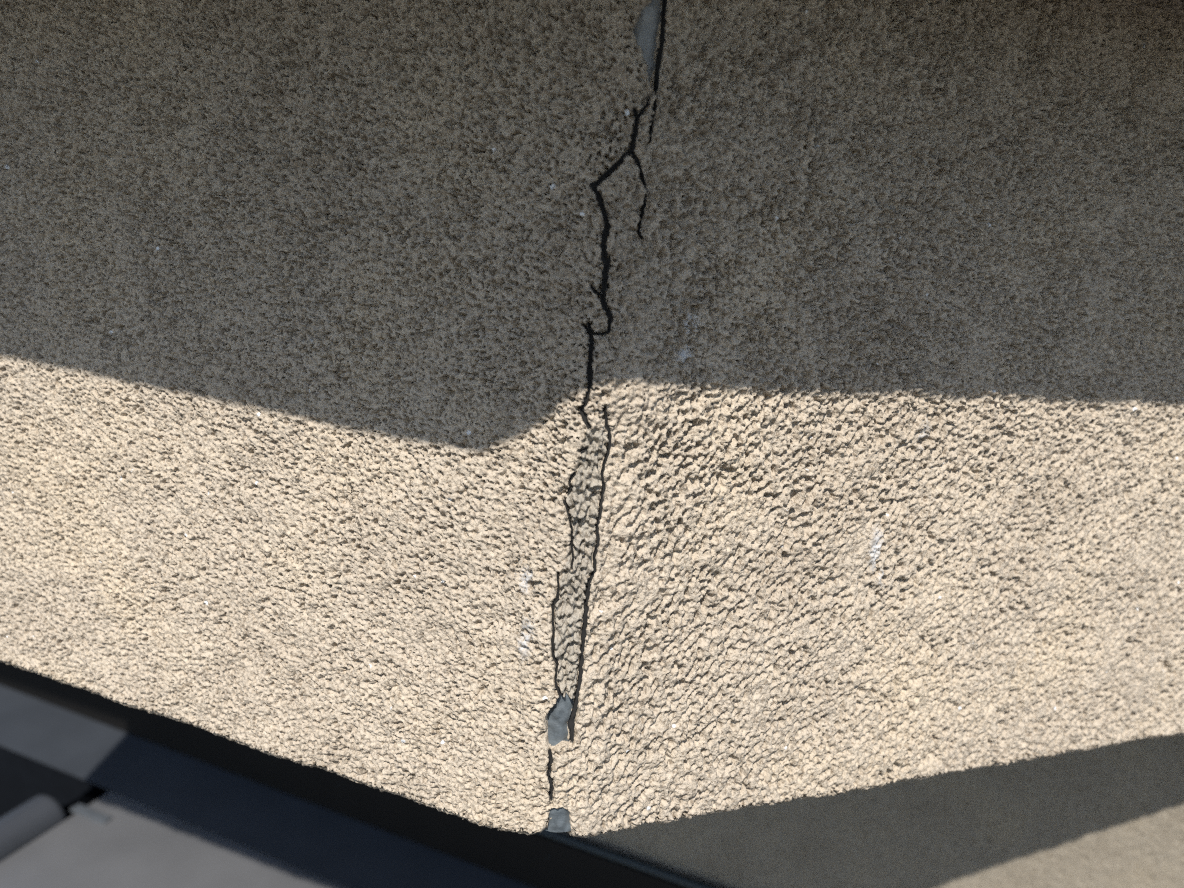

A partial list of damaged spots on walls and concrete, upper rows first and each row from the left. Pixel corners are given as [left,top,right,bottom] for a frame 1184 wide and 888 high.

peeling [597,0,662,306]
crack [547,0,667,803]
spalling [547,428,609,746]
spalling [544,790,581,832]